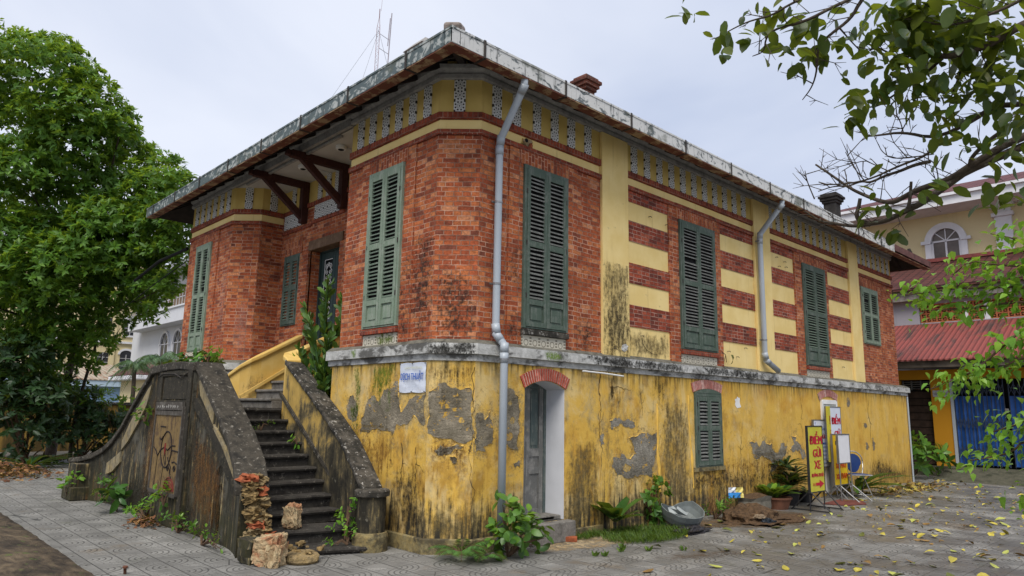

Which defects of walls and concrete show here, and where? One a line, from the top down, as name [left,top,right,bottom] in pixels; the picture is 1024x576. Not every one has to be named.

damp [576,264,683,393]
damp [394,470,466,537]
flaking render [346,374,525,472]
damp [569,446,597,521]
flaking render [600,418,661,483]
damp [663,404,785,500]
flaking render [749,434,806,473]